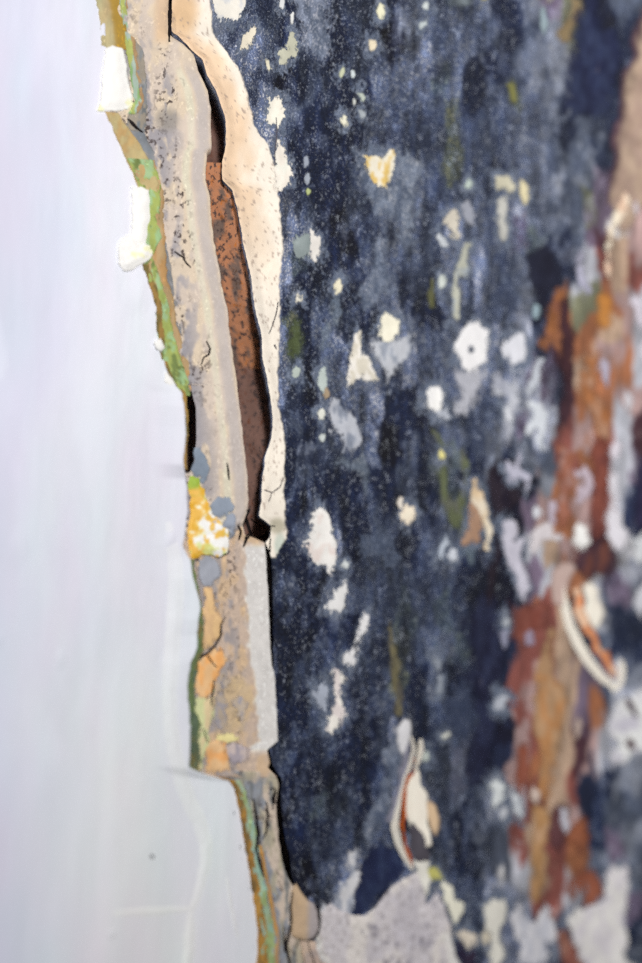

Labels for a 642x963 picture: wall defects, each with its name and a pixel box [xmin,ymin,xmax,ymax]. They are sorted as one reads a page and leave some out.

peeling [604,193,639,278]
crack [199,73,284,661]
peeling [415,166,594,649]
peeling [600,359,610,387]
peeling [629,296,642,331]
spalling [96,0,559,963]
rust [490,169,642,963]
peeling [604,441,642,568]
peeling [551,563,642,765]
peeling [558,807,571,834]
peeling [567,865,630,963]